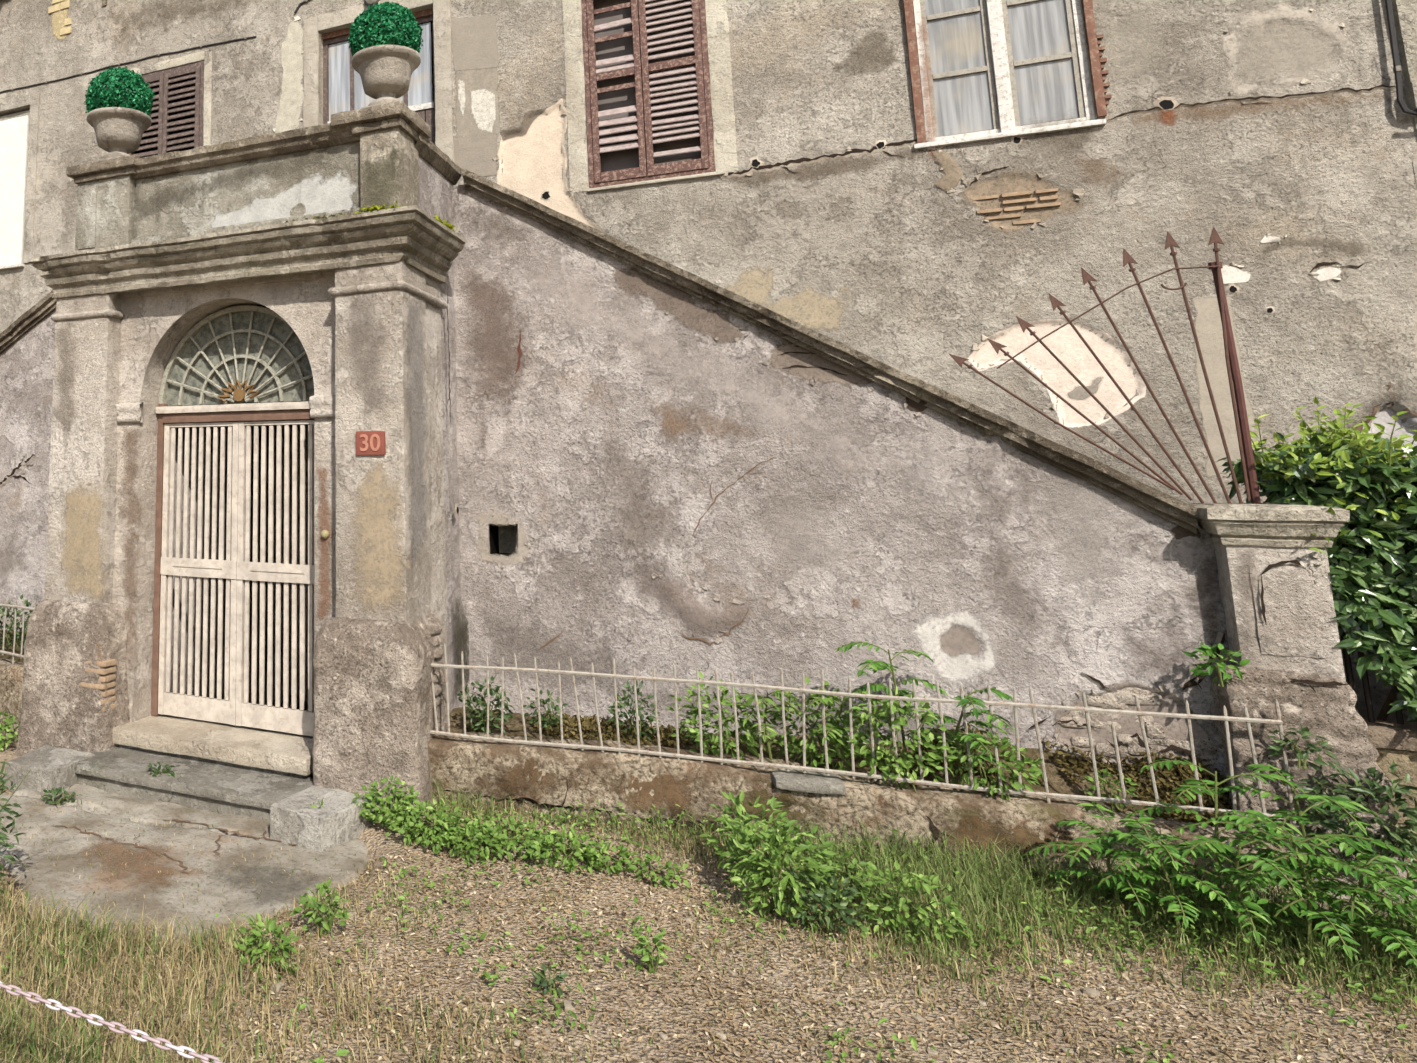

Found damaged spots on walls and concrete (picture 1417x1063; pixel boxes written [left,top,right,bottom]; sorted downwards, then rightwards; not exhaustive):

crack [1106,85,1396,123]
spalling [455,67,603,232]
crack [719,139,930,179]
spalling [928,147,1085,232]
spalling [615,269,750,343]
spalling [1213,262,1251,295]
spalling [1309,265,1342,282]
spalling [967,319,1146,428]
crack [0,452,36,489]
crack [1260,560,1313,625]
crack [1176,632,1225,690]
crack [55,819,296,874]